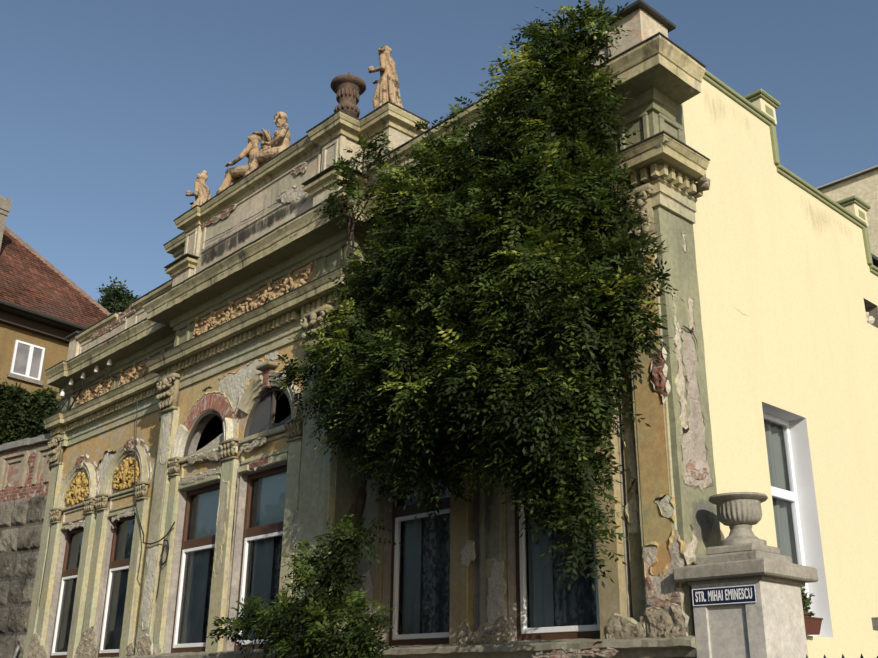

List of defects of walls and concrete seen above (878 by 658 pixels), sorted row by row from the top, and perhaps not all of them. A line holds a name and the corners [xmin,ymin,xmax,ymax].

flaking render [650,290,713,491]
flaking render [178,349,281,578]
flaking render [624,422,640,534]
flaking render [126,546,162,656]
flaking render [460,540,476,567]
spalling [456,560,513,646]
flaking render [531,494,698,658]